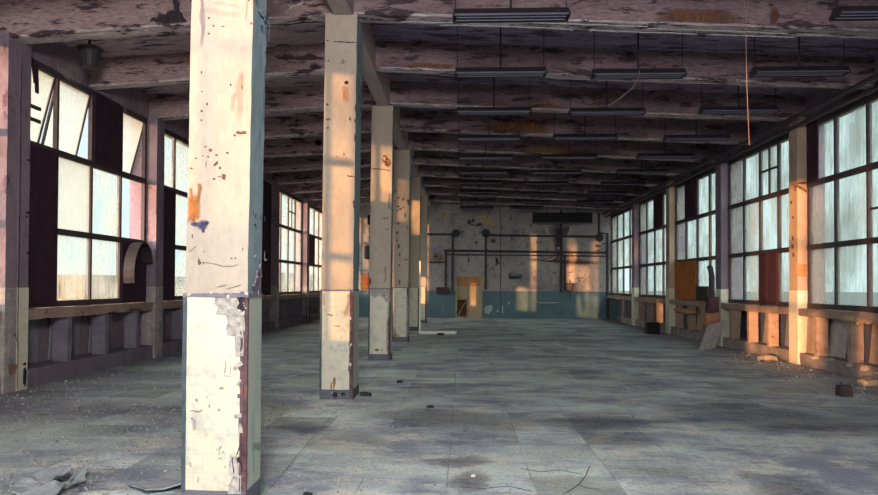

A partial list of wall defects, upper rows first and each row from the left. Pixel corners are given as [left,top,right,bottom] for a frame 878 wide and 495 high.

spalling [150,0,187,24]
corrosion [188,184,202,221]
peeling [209,248,267,433]
peeling [228,455,242,494]
crack [459,466,593,495]